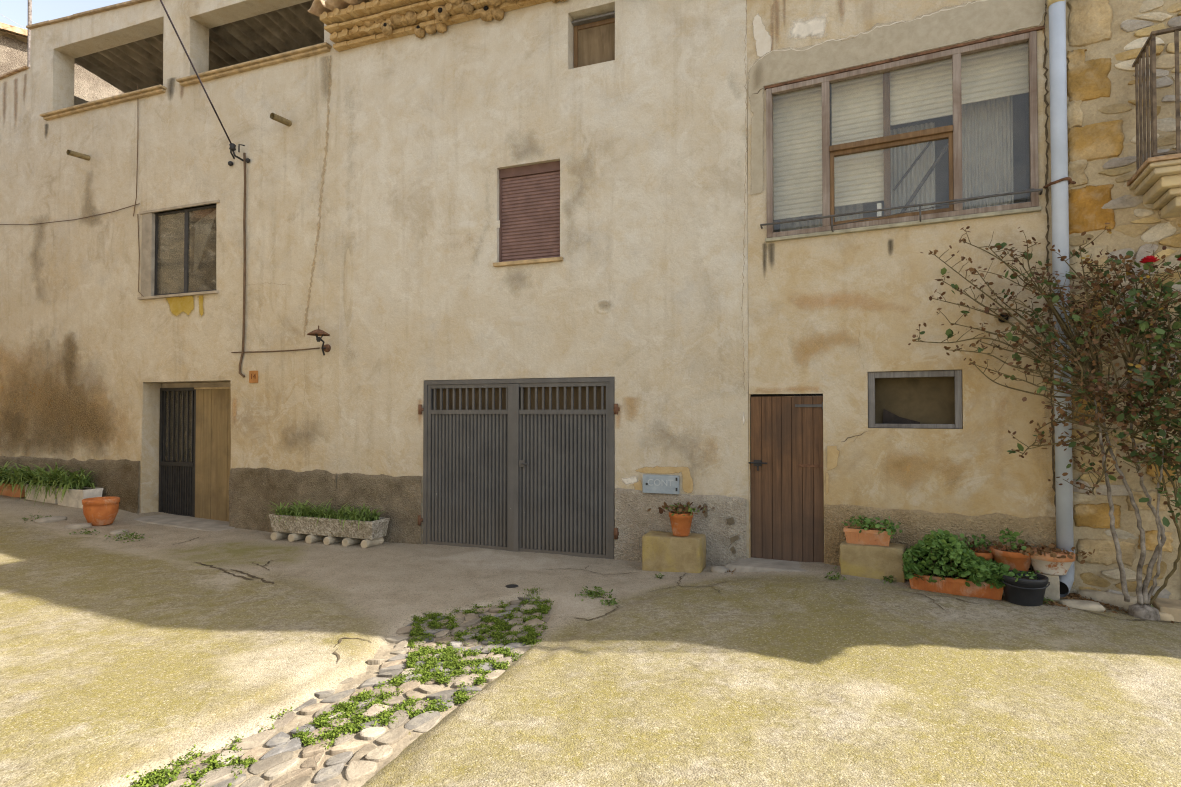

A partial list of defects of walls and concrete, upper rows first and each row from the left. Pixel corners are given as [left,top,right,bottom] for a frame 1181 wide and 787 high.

peeling [744,10,772,60]
peeling [791,18,826,38]